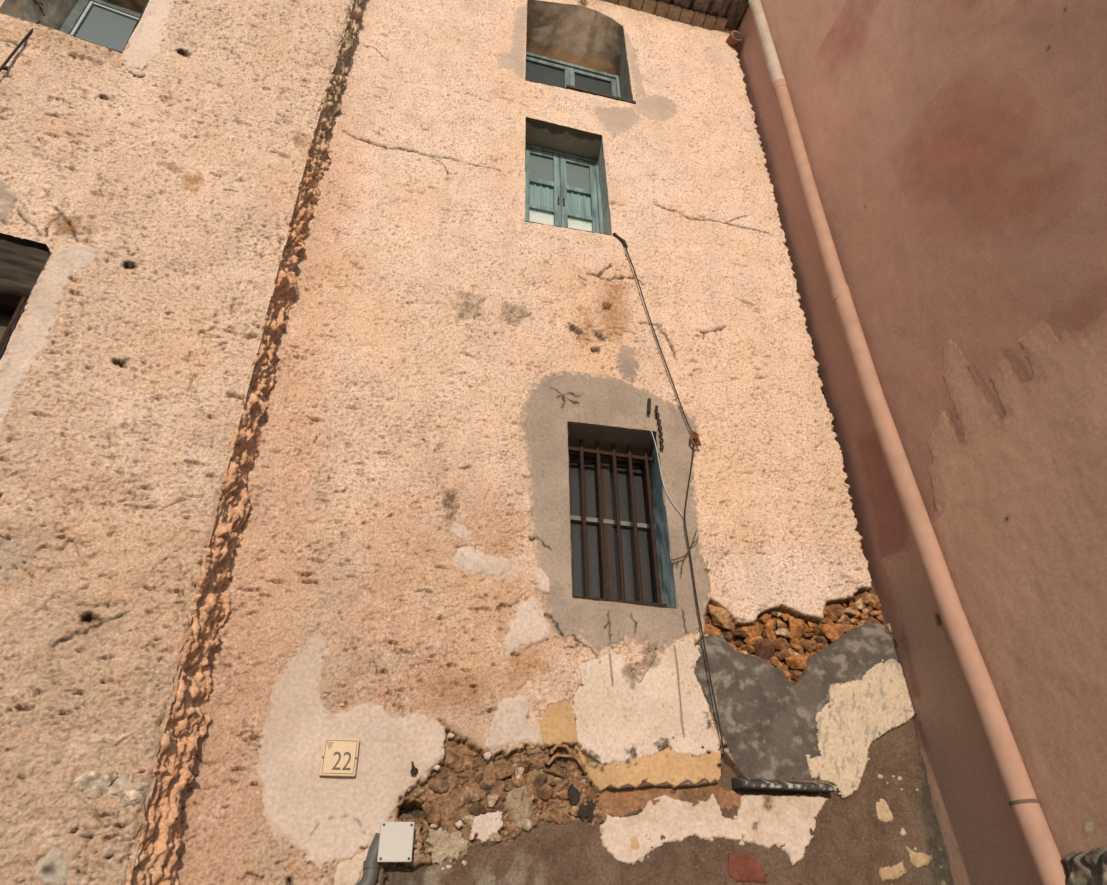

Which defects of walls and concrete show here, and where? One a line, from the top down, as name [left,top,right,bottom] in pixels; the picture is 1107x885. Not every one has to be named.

peeling [503,567,552,657]
spalling [256,591,954,885]